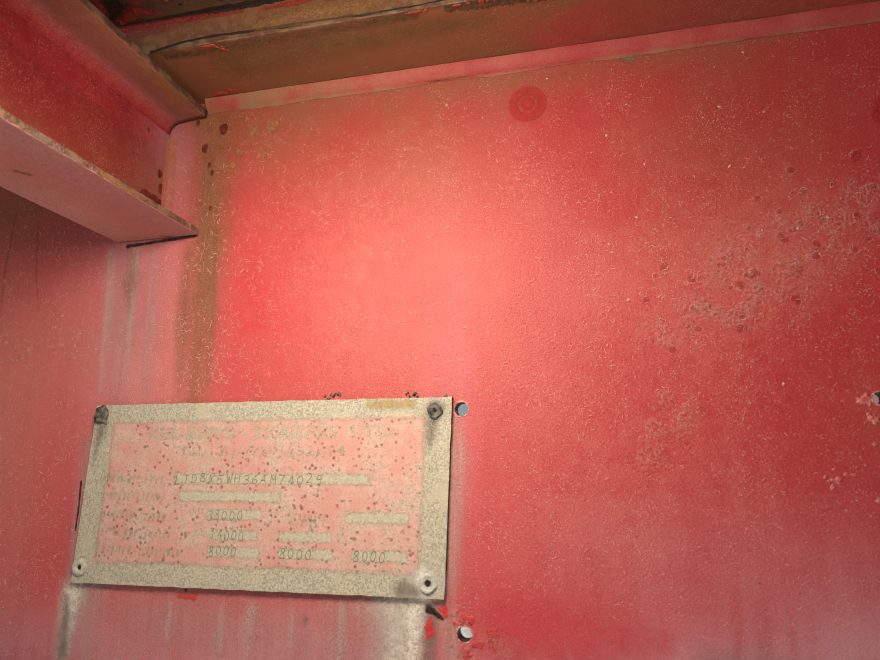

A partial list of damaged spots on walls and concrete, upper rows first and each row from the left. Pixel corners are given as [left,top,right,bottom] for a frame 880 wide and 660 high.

corrosion [101,0,128,25]
peeling [117,0,243,39]
peeling [424,602,448,640]